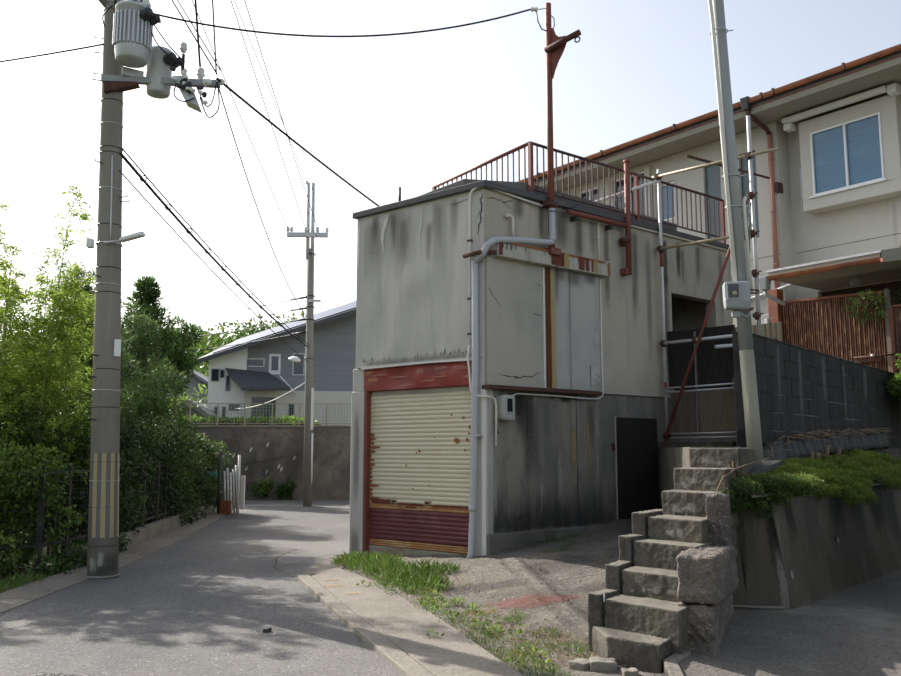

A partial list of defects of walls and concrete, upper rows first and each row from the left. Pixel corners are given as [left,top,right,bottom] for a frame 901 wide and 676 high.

corrosion [499,242,611,388]